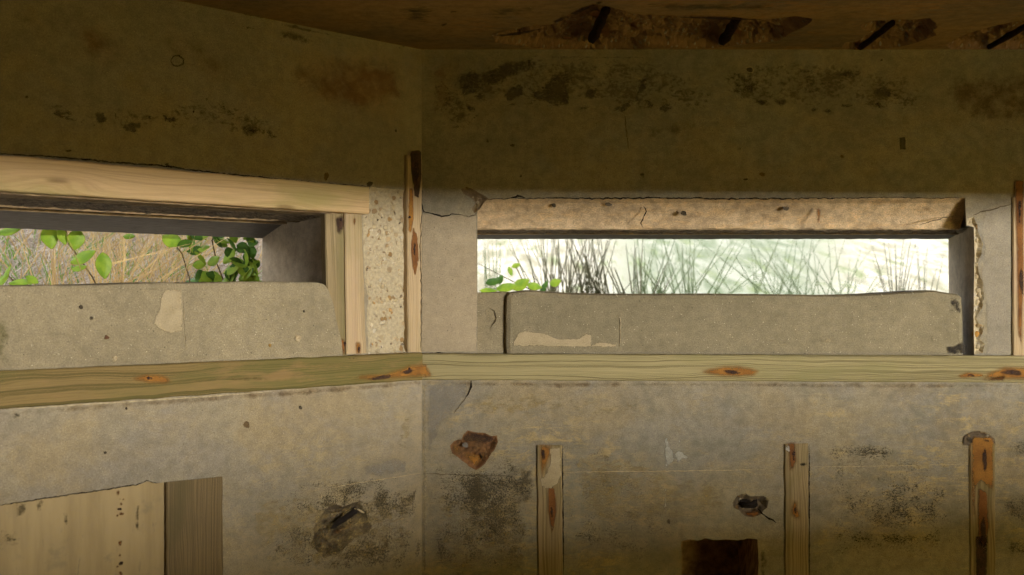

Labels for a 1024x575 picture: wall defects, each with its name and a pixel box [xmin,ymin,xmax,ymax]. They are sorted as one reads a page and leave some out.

spalling [446,2,813,120]
spalling [841,18,938,50]
spalling [945,20,1024,49]
crack [419,190,1010,341]
spalling [312,501,372,558]
mould [433,457,532,568]
hole [733,493,776,523]